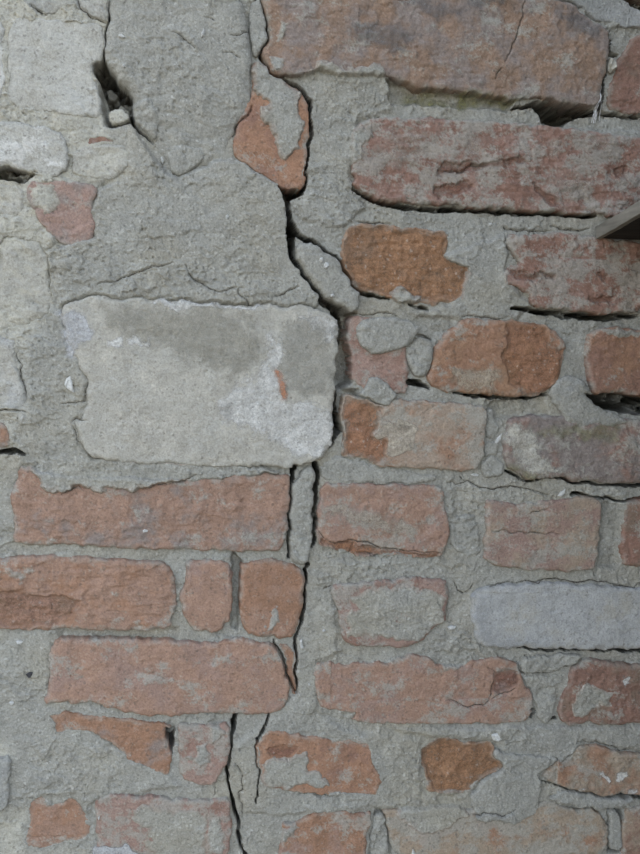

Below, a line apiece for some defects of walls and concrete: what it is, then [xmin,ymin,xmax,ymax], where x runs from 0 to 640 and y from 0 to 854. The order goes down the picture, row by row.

crack [95,55,140,134]
crack [280,81,396,345]
crack [97,263,249,306]
crack [273,389,439,689]
crack [215,713,261,854]
crack [256,713,270,742]